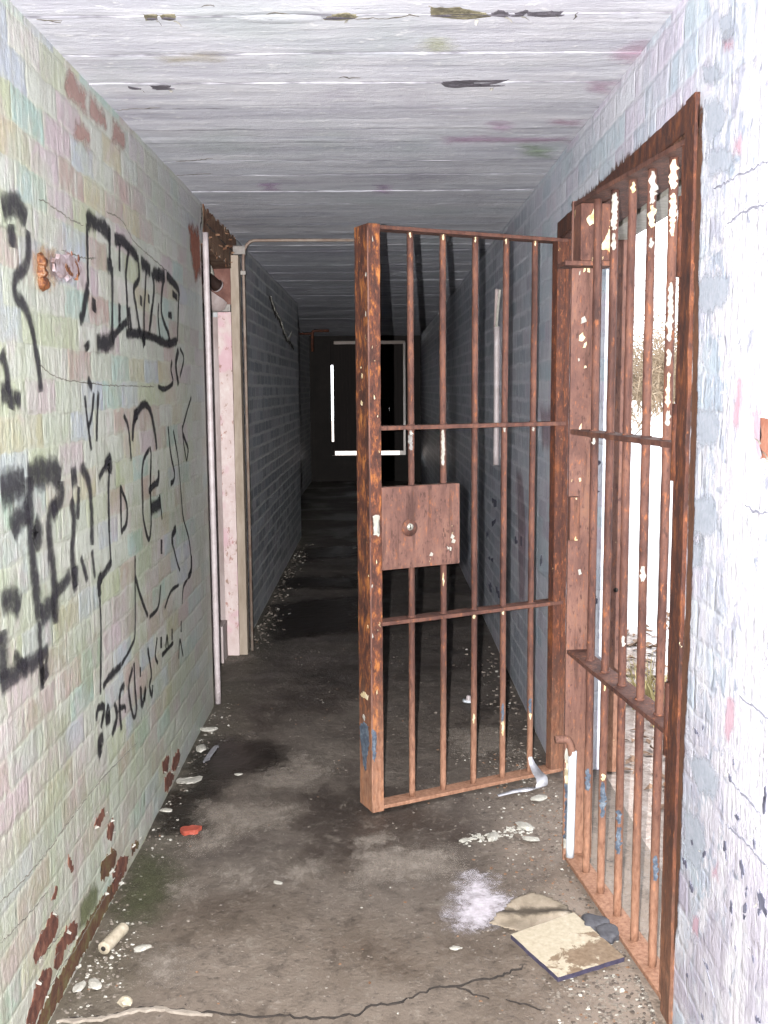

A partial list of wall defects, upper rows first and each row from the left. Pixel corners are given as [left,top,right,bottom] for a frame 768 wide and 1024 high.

spalling [429,6,564,25]
spalling [440,79,509,90]
peeling [601,192,619,253]
peeling [647,159,679,248]
rust [669,105,703,943]
peeling [162,749,182,793]
leakage [155,737,289,835]
peeling [26,808,142,1024]
spalling [134,944,152,953]
crack [56,965,545,1024]